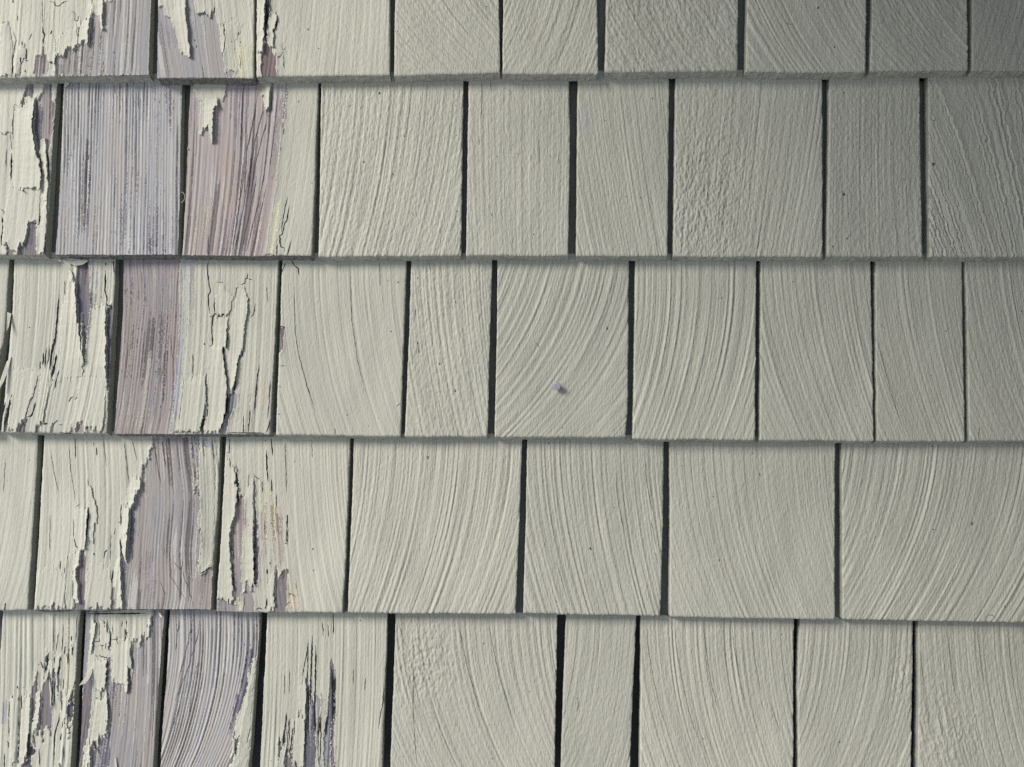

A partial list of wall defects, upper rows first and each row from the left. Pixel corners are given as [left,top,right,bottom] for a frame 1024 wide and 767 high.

peeling [0,0,289,767]
peeling [278,659,335,767]